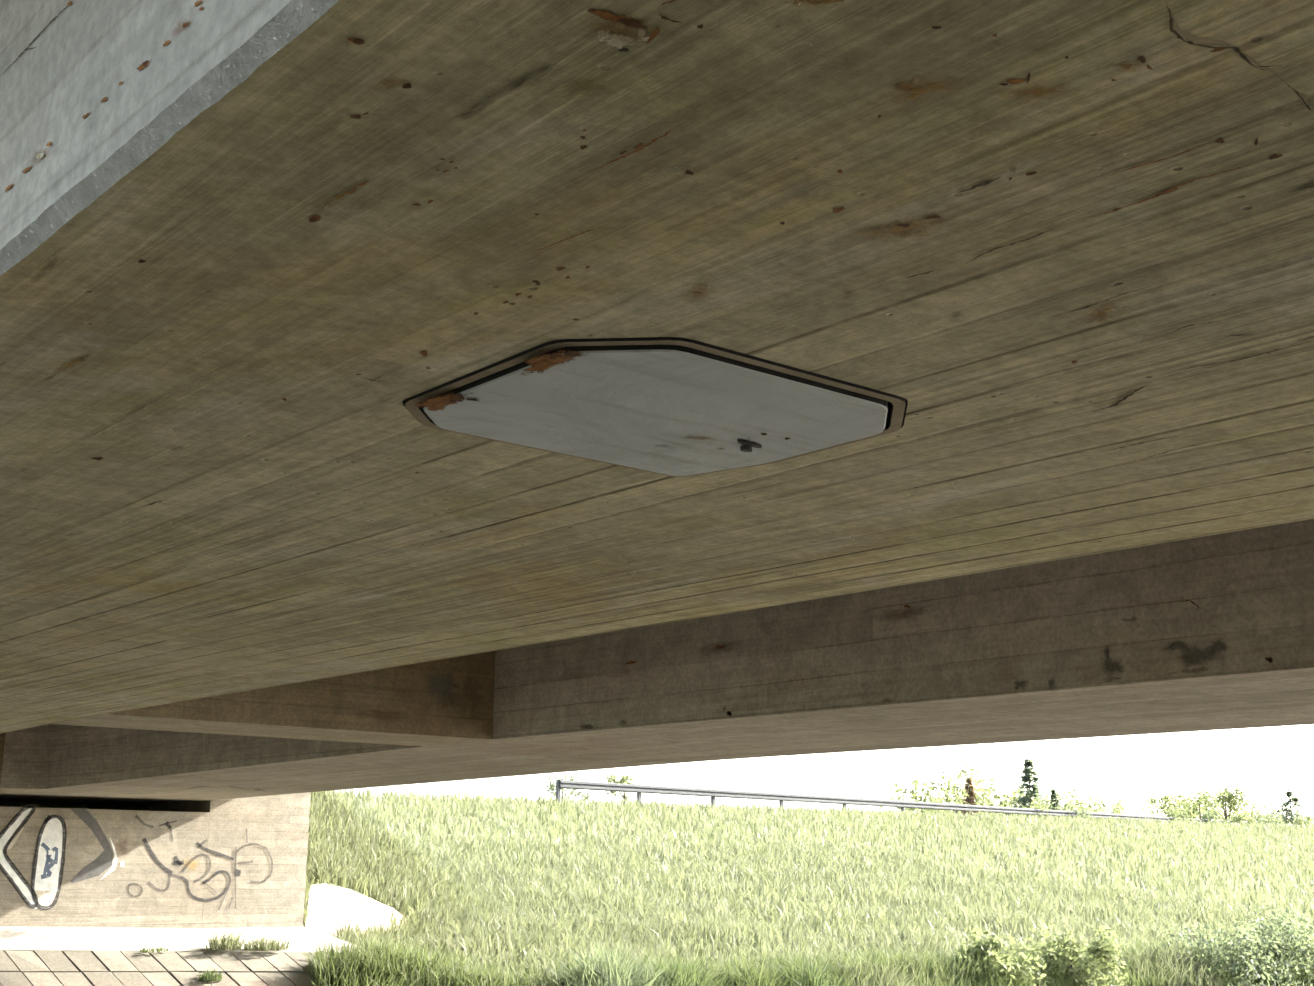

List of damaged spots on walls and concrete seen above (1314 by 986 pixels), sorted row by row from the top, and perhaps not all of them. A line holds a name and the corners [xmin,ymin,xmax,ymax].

spalling [588,9,660,52]
crack [1166,1,1314,110]
rust [522,349,589,375]
rust [416,393,480,411]
leakage [1168,642,1225,665]